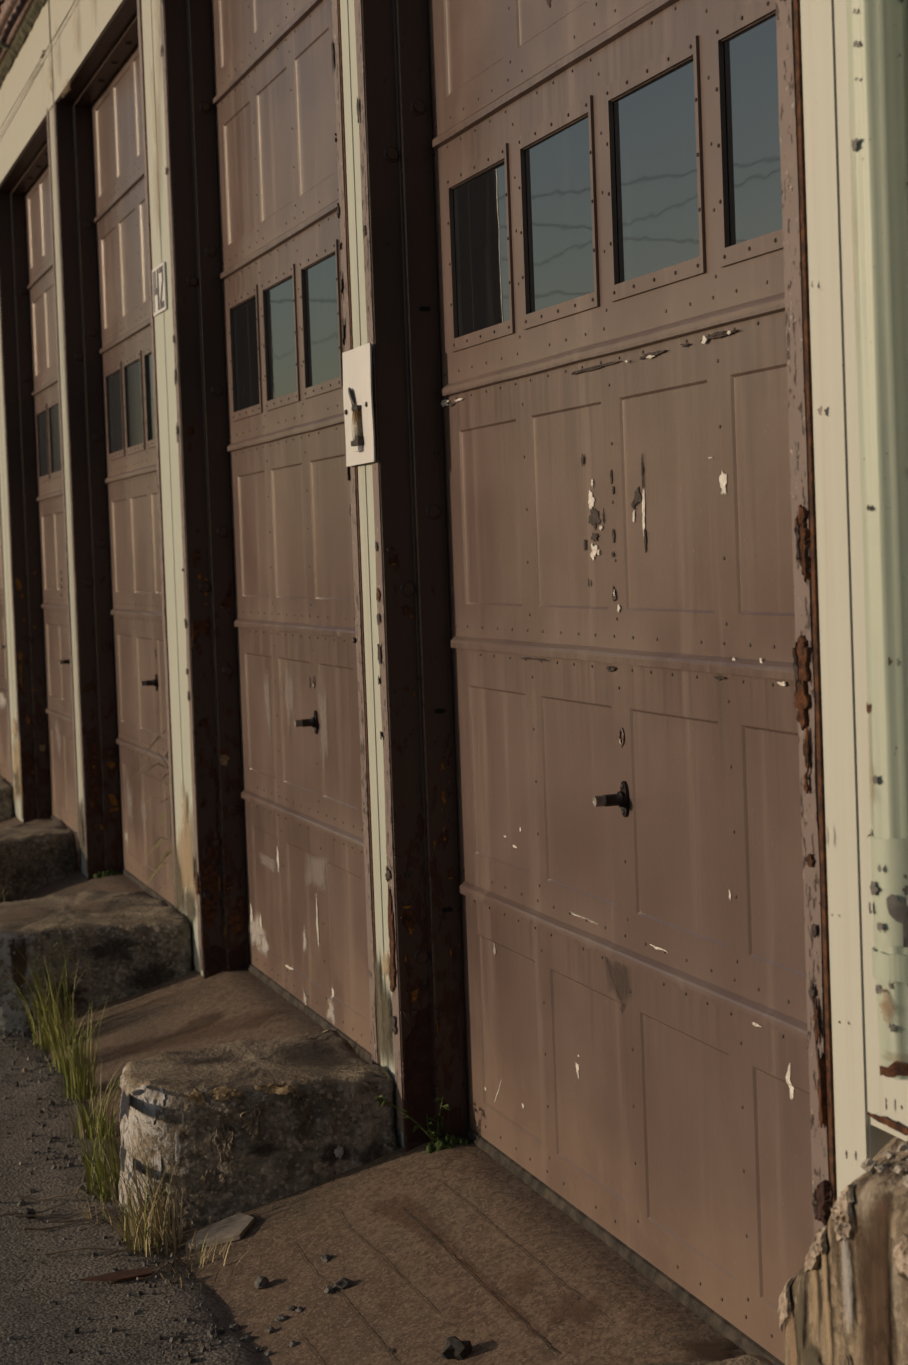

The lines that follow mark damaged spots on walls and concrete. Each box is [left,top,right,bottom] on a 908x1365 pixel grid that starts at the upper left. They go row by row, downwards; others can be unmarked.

peeling [571,329,740,375]
peeling [581,454,615,561]
peeling [631,457,647,553]
corrosion [794,504,811,583]
corrosion [792,634,813,794]
corrosion [201,857,218,930]
corrosion [385,866,395,992]
peeling [869,864,908,948]
corrosion [879,1061,908,1077]
corrosion [867,1112,908,1136]
spalling [778,1183,855,1332]
spalling [892,1234,908,1282]